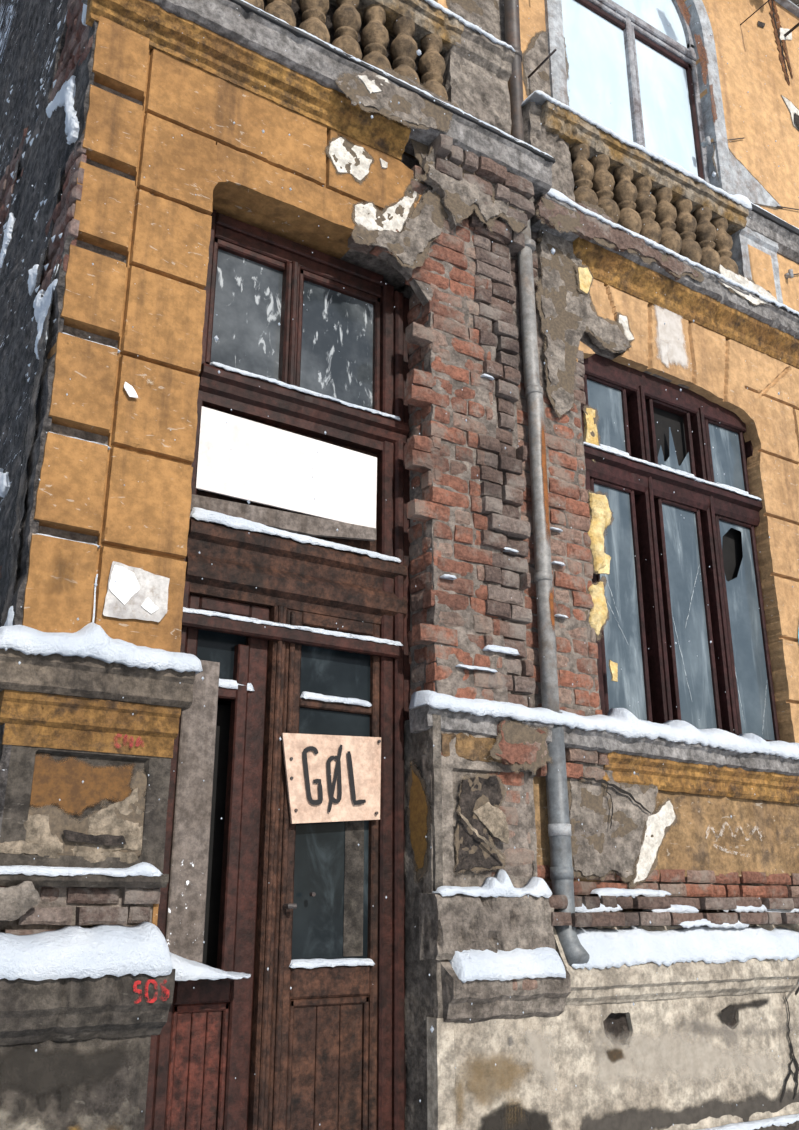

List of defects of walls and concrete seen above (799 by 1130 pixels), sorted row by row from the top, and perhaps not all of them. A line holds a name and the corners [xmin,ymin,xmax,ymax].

rust [769,0,793,85]
flaking render [325,136,388,184]
spalling [0,126,87,626]
spalling [335,68,704,720]
flaking render [0,755,147,864]
spalling [454,719,677,889]
crack [579,777,651,829]
spalling [0,881,160,935]
water stain [597,1032,797,1083]
crack [780,987,799,1102]
water stain [480,1104,552,1130]
water stain [581,1089,799,1130]